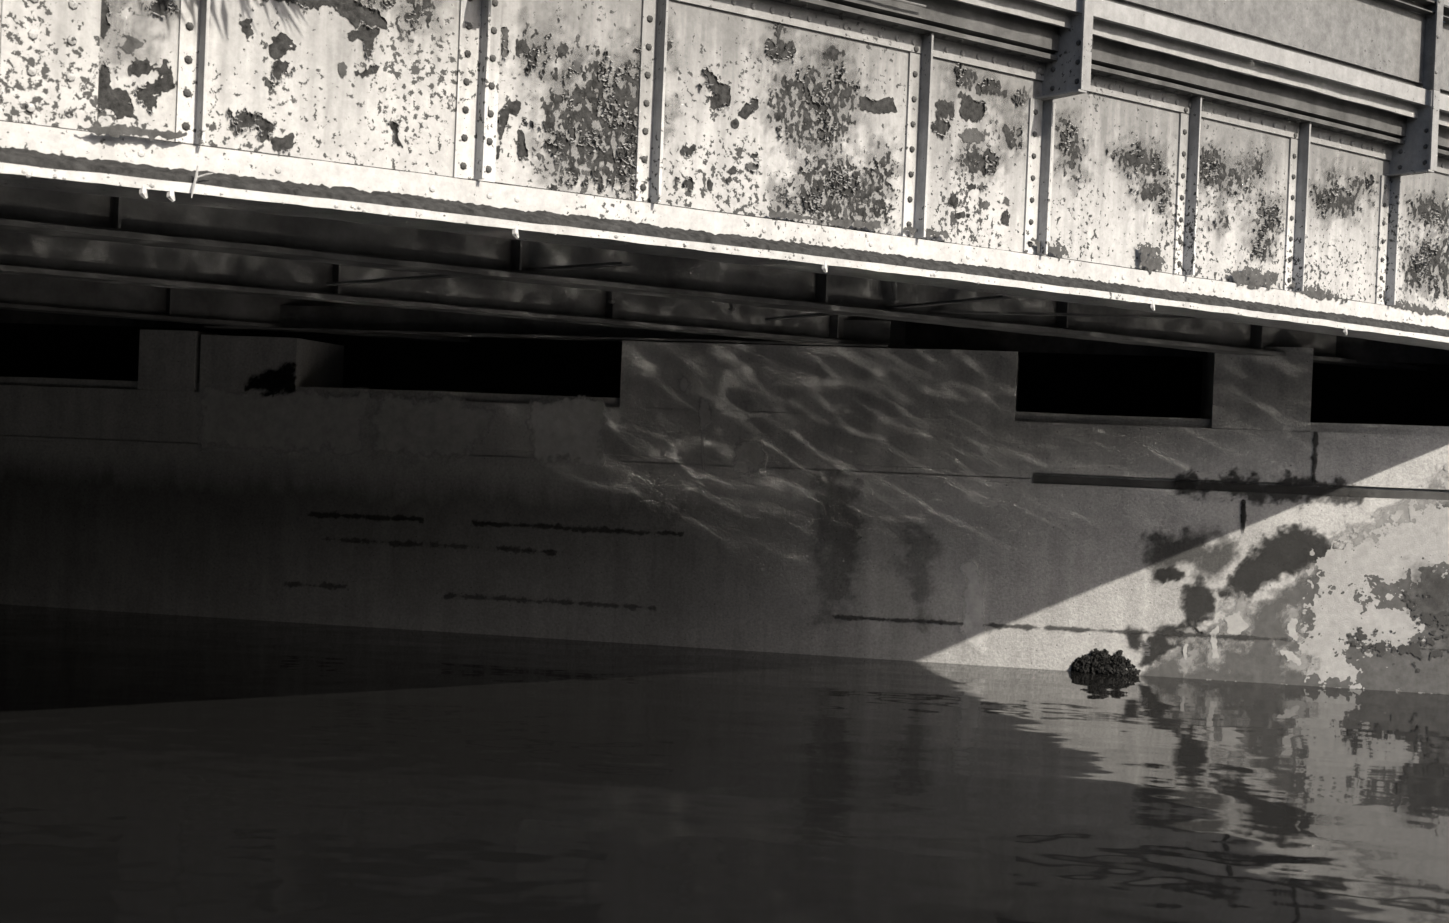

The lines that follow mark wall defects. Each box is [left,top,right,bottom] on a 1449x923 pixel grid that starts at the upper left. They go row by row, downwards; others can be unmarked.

peeling [79,0,175,119]
peeling [226,107,296,153]
peeling [239,14,297,91]
peeling [264,0,439,79]
peeling [496,17,652,196]
peeling [699,21,902,234]
peeling [930,62,1029,226]
peeling [1403,189,1449,304]
water stain [1145,527,1238,579]
water stain [1272,466,1449,689]
water stain [1127,627,1144,650]
water stain [1167,592,1253,680]